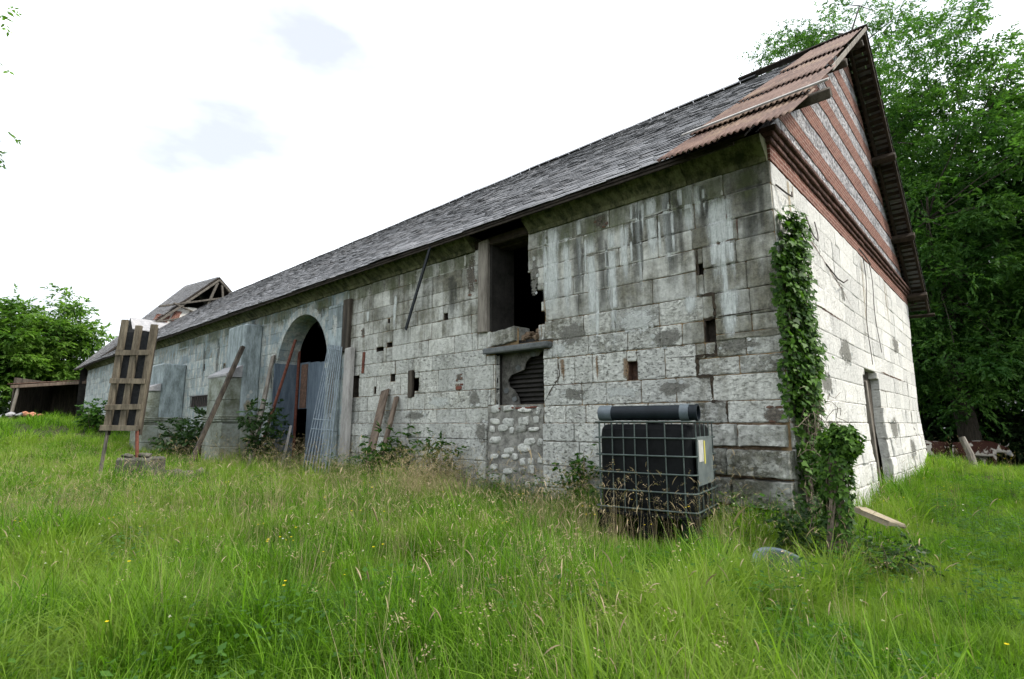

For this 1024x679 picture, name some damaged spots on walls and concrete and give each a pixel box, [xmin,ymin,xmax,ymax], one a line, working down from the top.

spalling [531,256,539,295]
leakage [540,179,737,334]
flaking render [502,322,586,405]